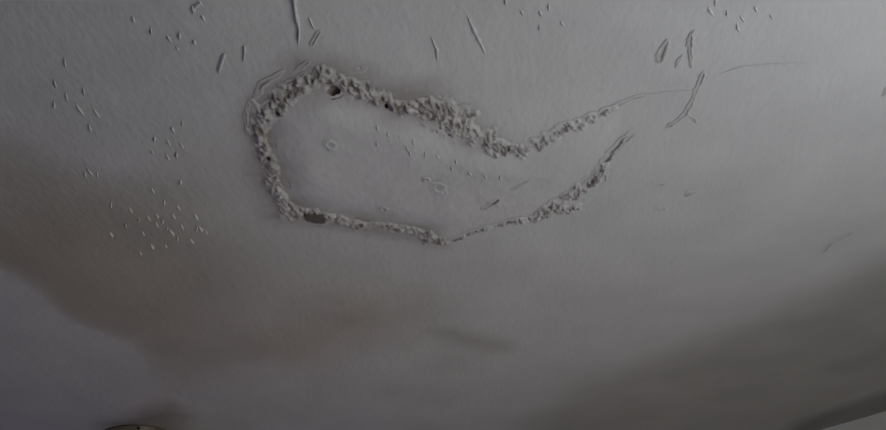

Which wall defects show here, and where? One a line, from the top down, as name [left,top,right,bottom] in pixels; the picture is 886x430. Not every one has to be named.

crack [524,30,809,152]
crack [452,131,636,242]